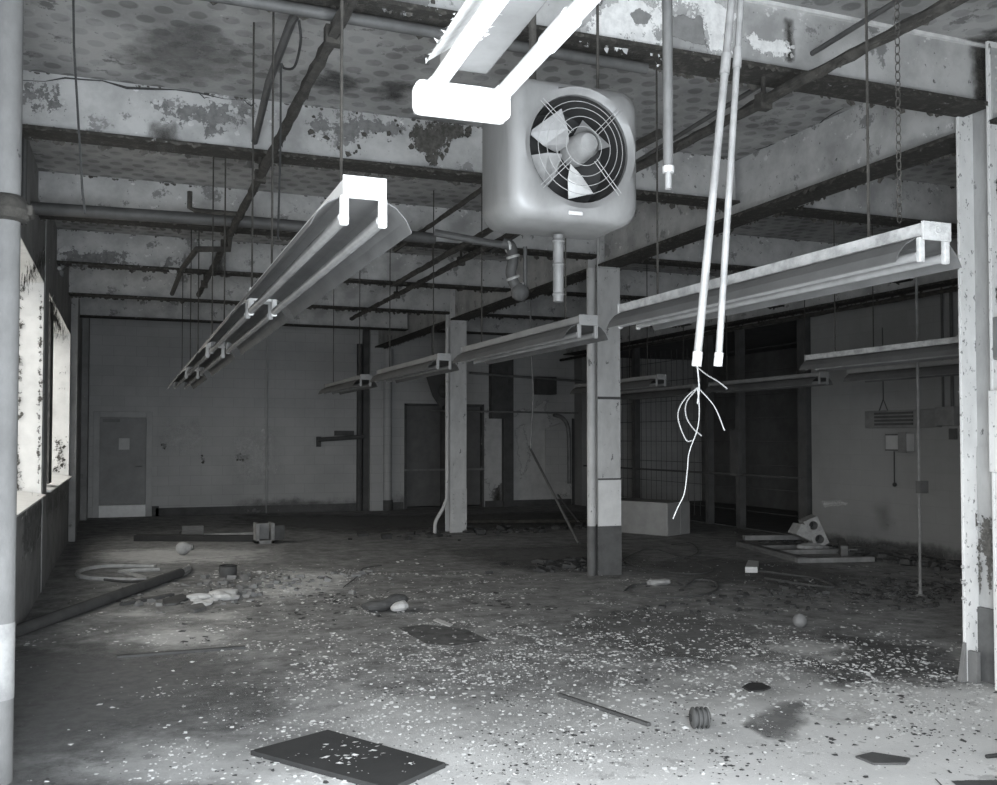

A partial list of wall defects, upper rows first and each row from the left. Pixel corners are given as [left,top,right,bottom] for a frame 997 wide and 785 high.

peeling [579,0,737,67]
peeling [744,32,796,58]
peeling [23,81,65,113]
crack [23,77,255,107]
peeling [150,98,251,139]
spalling [305,110,473,166]